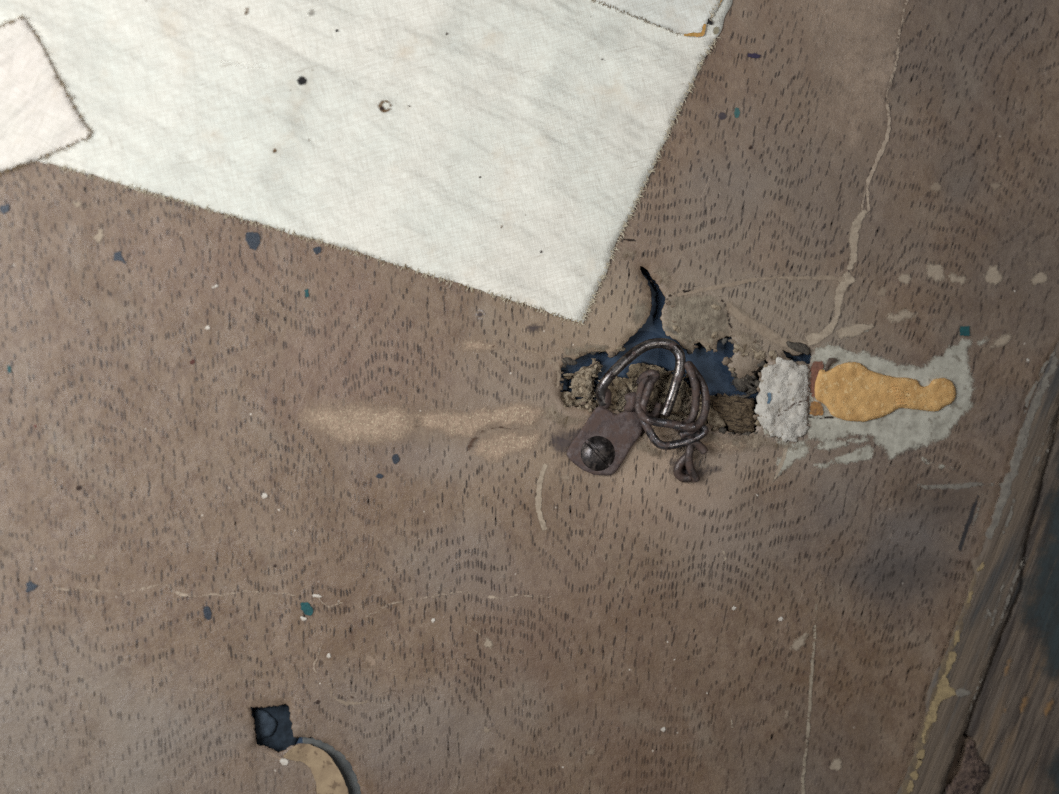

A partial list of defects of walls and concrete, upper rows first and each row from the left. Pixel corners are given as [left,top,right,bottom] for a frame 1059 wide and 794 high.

crack [650,0,908,419]
spalling [545,268,810,451]
spalling [252,704,361,794]